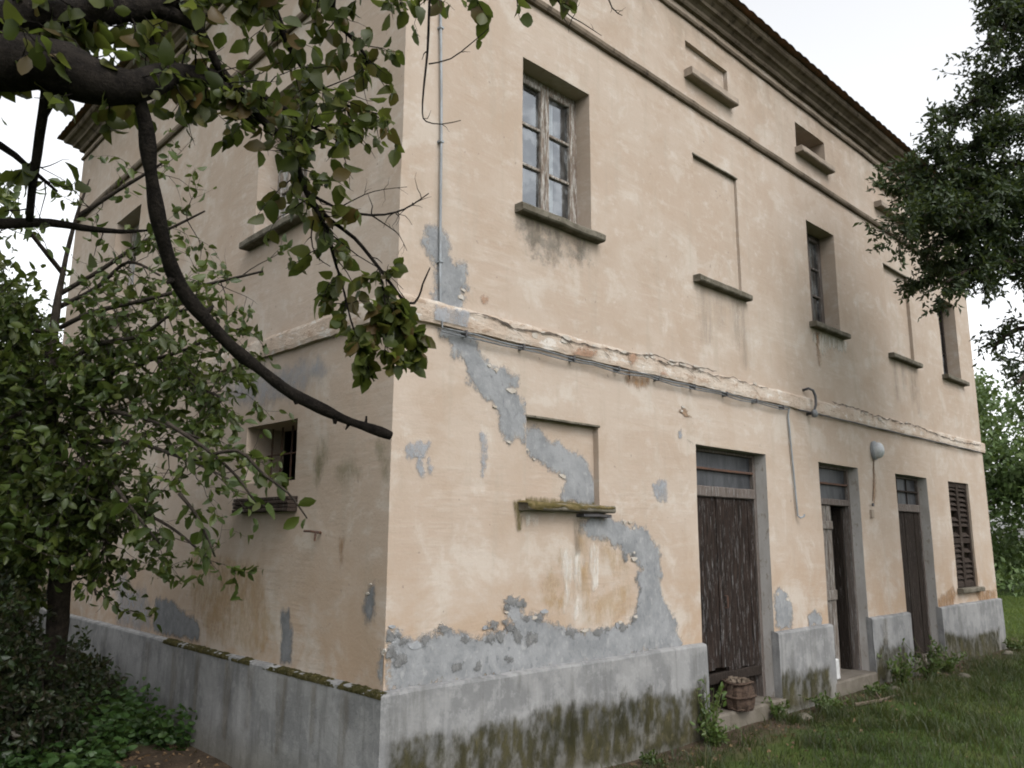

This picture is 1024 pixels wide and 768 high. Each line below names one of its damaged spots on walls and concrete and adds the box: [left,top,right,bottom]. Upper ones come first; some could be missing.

crack [832,401,981,446]
spalling [381,595,549,667]
spalling [558,605,639,639]